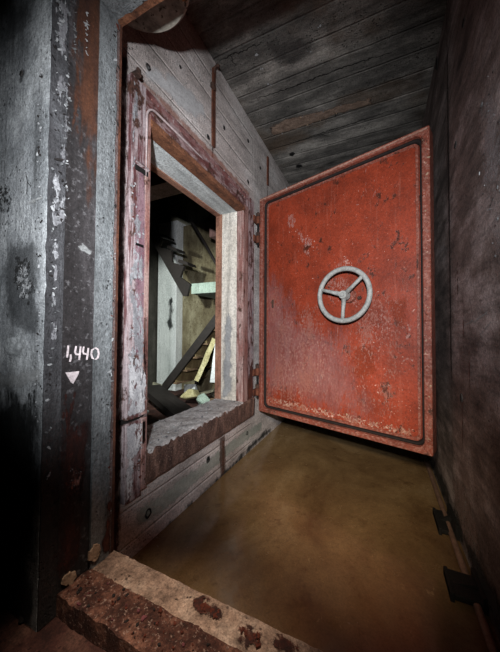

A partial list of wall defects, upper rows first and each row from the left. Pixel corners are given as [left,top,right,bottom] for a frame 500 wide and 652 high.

rust [72,0,100,136]
peeling [49,72,72,313]
rust [150,100,249,212]
peeling [128,157,146,416]
peeling [268,396,415,436]
rust [56,569,262,652]